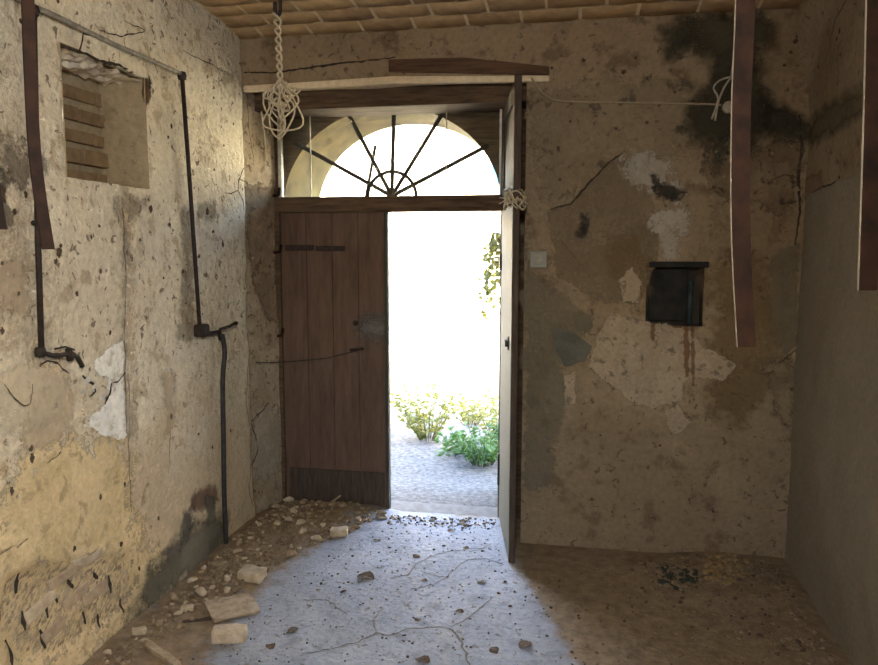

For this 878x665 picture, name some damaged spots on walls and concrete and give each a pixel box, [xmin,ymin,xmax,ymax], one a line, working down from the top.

crack [182,50,395,77]
water stain [658,12,734,170]
water stain [750,9,863,146]
water stain [0,134,30,227]
crack [771,115,839,246]
peeling [547,154,737,435]
peeling [0,330,167,665]
crack [302,598,492,665]
crack [391,544,502,589]